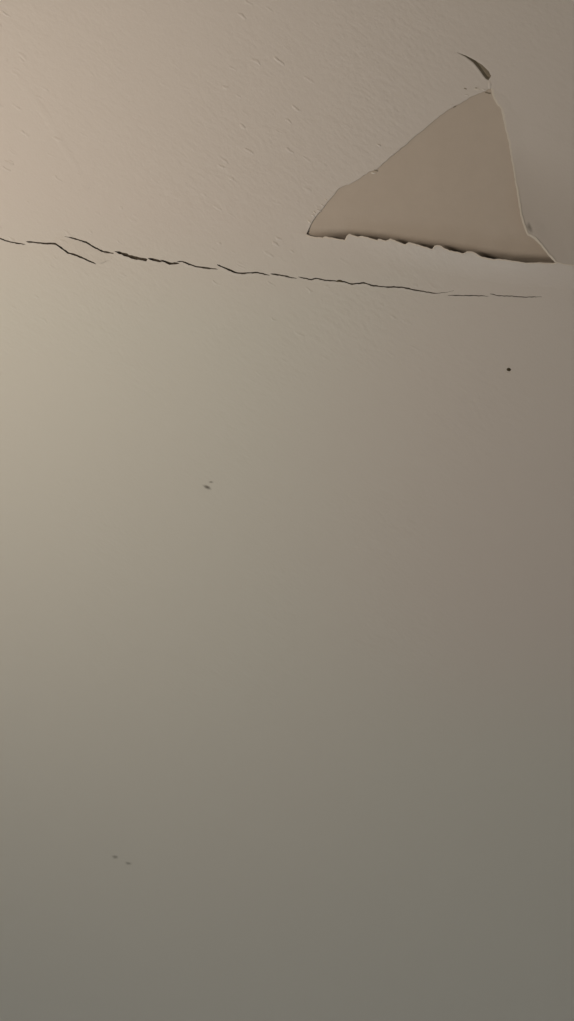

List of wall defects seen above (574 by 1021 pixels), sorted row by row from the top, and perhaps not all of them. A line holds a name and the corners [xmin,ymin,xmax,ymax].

crack [0,236,534,298]
peeling [289,81,574,289]